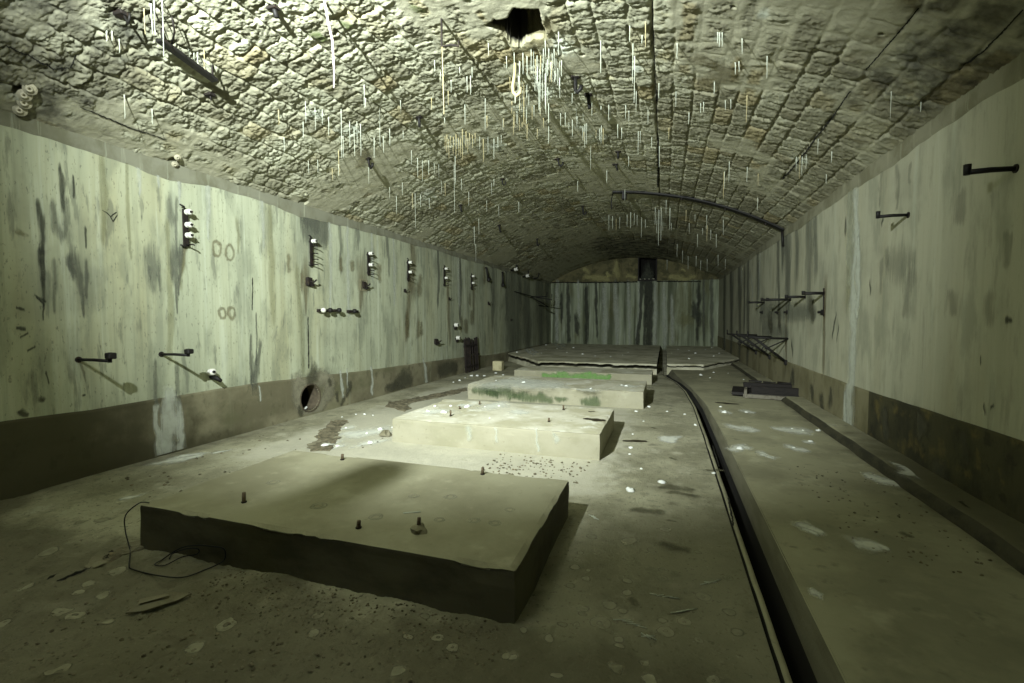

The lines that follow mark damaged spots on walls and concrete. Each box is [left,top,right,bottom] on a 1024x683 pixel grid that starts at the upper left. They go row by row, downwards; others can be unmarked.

damp [58,165,75,211]
damp [36,200,45,320]
damp [67,256,88,316]
damp [170,250,183,313]
damp [300,217,329,248]
damp [554,282,598,349]
damp [635,265,654,345]
damp [844,189,860,425]